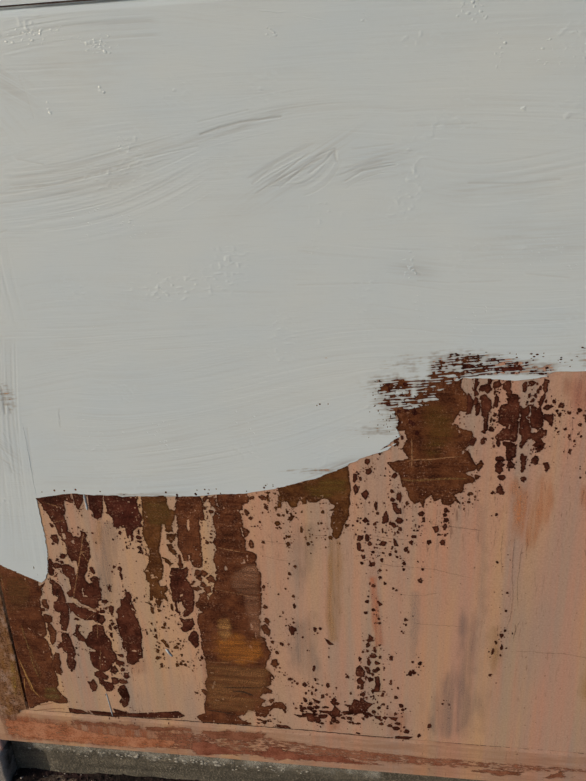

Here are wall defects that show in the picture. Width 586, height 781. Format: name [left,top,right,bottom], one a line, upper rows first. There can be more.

corrosion [0,347,586,779]